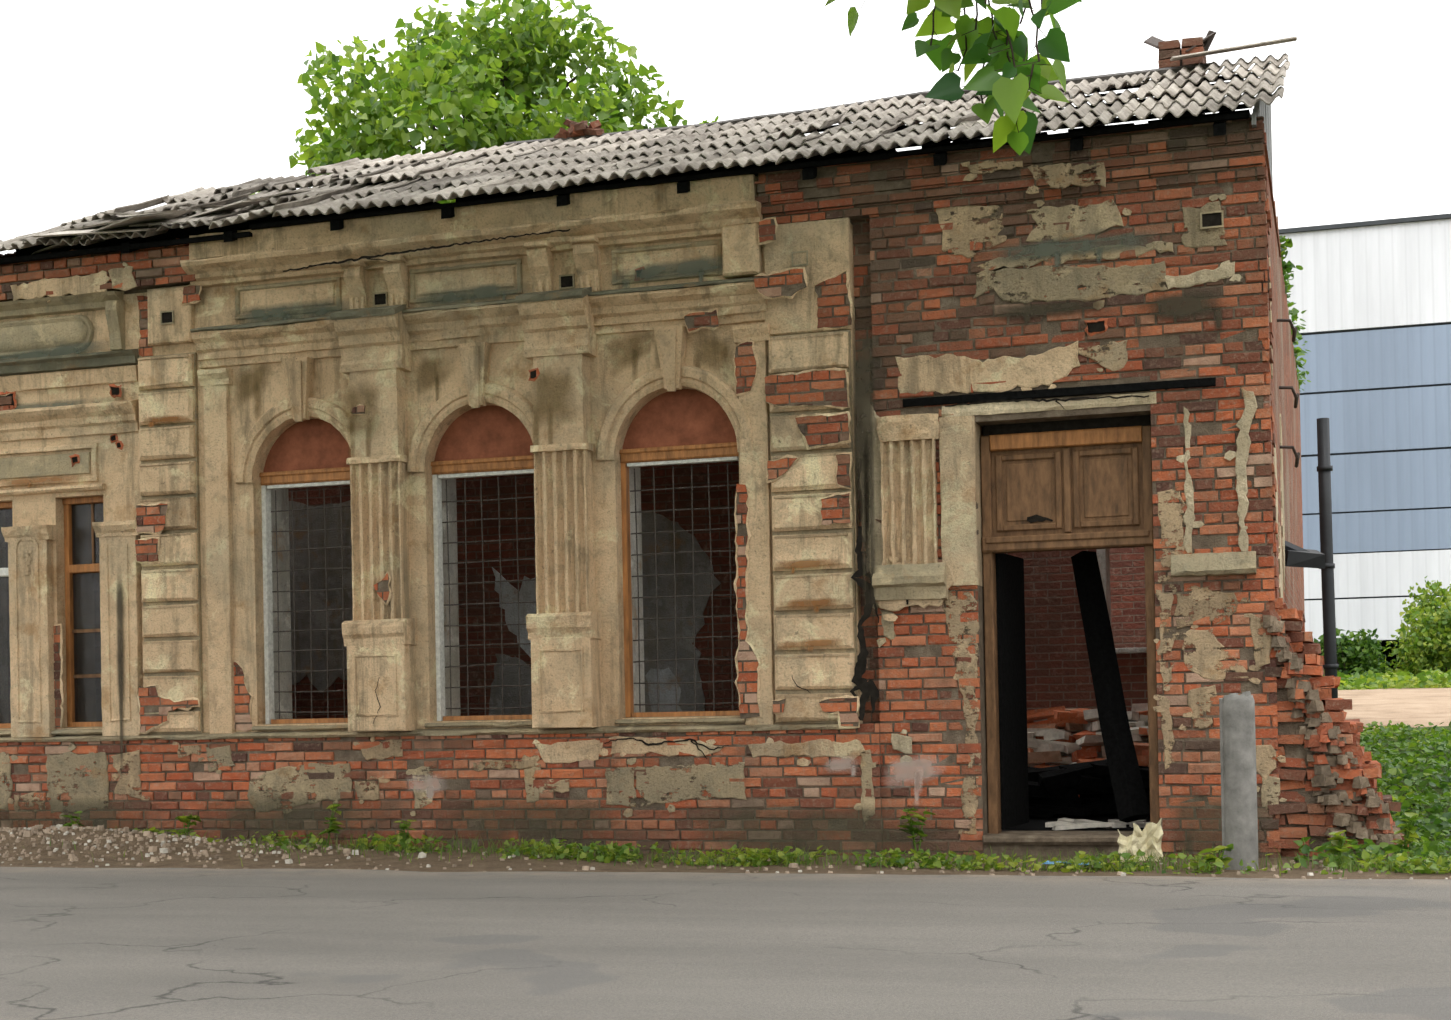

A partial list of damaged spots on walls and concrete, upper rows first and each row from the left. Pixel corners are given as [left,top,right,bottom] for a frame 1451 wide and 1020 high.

flaking render [10,262,154,357]
flaking render [181,284,202,306]
flaking render [895,160,1243,394]
spalling [109,384,122,398]
flaking render [733,341,913,572]
flaking render [134,501,170,564]
flaking render [641,484,785,719]
flaking render [1153,387,1272,770]
crack [604,738,729,759]
flaking render [473,695,876,823]
flaking render [873,562,982,835]
flaking render [1256,745,1287,812]